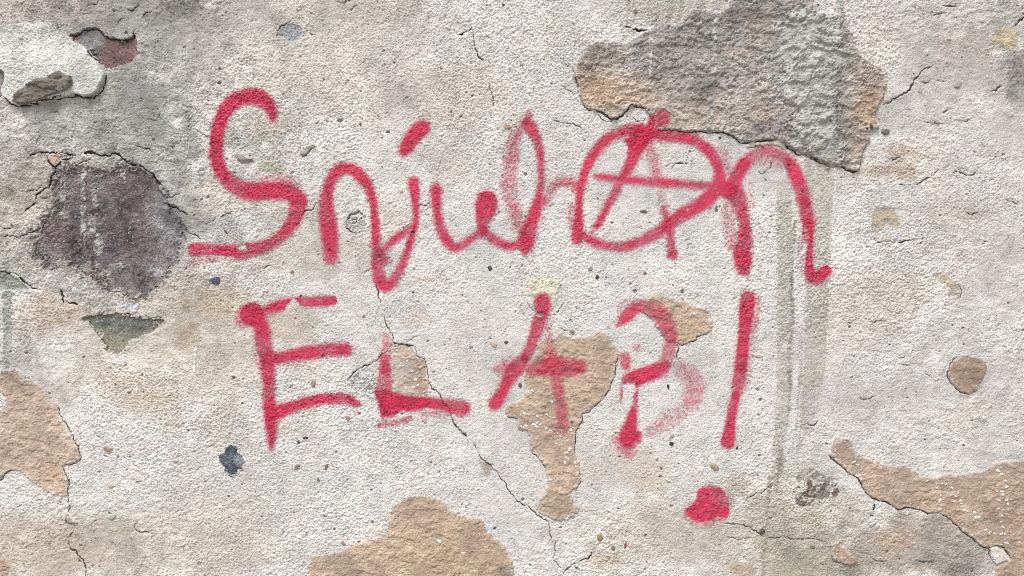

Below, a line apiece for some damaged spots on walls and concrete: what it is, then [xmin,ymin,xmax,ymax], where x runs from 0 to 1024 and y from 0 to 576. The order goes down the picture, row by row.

flaking render [70,27,139,69]
peeling [573,0,887,173]
peeling [0,369,82,497]
water stain [62,169,138,312]
flaking render [28,154,188,354]
crack [2,138,239,252]
crack [348,257,601,574]
peeling [505,332,619,521]
peeling [641,293,713,346]
peeling [947,355,987,395]
peeling [308,495,514,576]
peeling [829,438,1024,576]